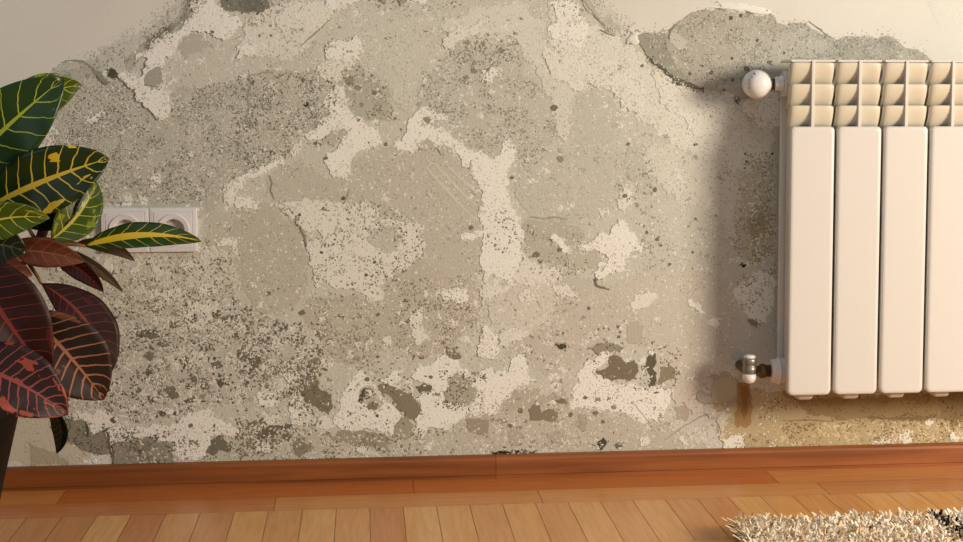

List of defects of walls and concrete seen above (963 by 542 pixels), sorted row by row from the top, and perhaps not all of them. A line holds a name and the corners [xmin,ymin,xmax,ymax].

spalling [837,35,929,60]
damp [520,0,926,313]
damp [9,0,593,466]
peeling [29,0,842,464]
damp [471,337,963,455]
rust [734,382,753,428]
peeling [871,429,913,444]